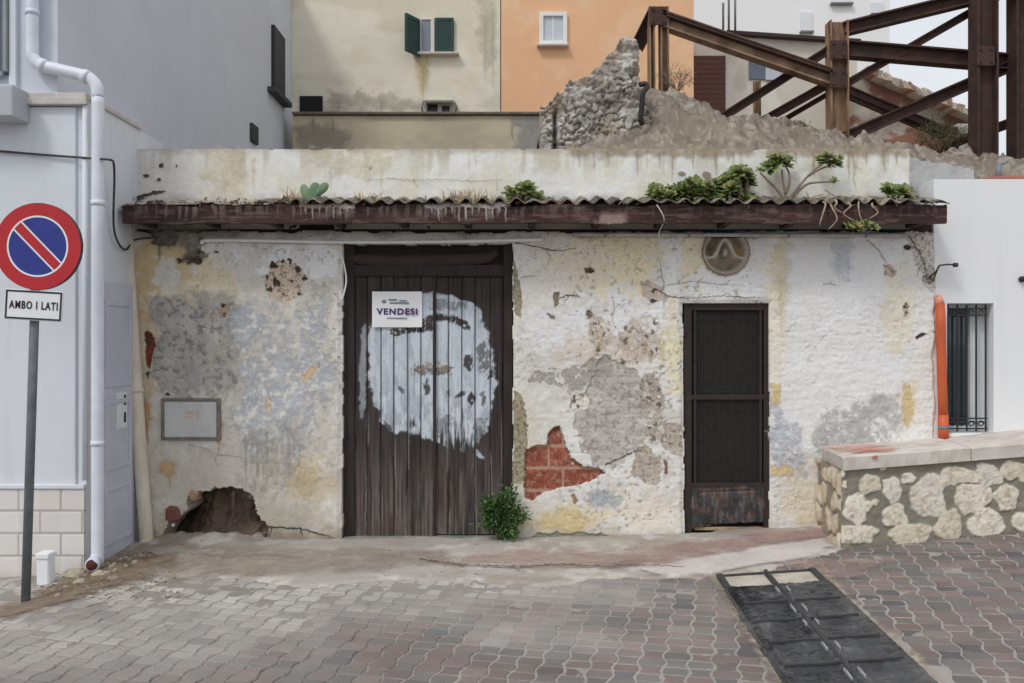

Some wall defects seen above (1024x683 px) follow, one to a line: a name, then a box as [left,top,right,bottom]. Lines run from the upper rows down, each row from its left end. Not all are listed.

crack [866,237,928,275]
spalling [641,280,666,303]
peeling [144,258,339,459]
peeling [512,310,684,504]
peeling [769,394,905,478]
hole [163,486,269,538]
crack [189,525,336,565]
crack [419,558,685,572]